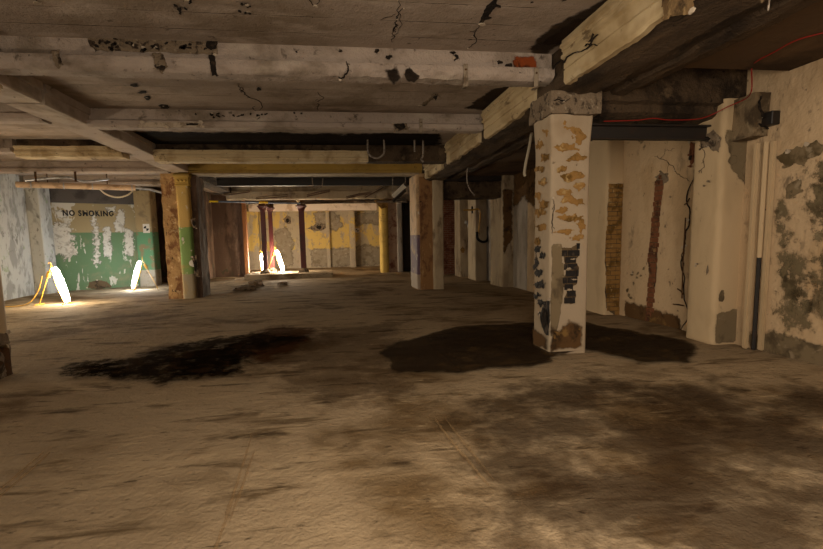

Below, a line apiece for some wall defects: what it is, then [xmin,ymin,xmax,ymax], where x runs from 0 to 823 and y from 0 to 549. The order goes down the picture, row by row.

crack [381,0,405,41]
spalling [661,0,696,20]
peeling [53,210,76,262]
peeling [90,206,135,264]
flaking render [274,227,294,268]
flaking render [310,244,380,267]
flaking render [355,212,379,226]
flaking render [533,120,587,336]
flaking render [605,171,669,321]
crack [655,145,705,329]
flaking render [773,140,823,334]
spalling [86,279,112,289]